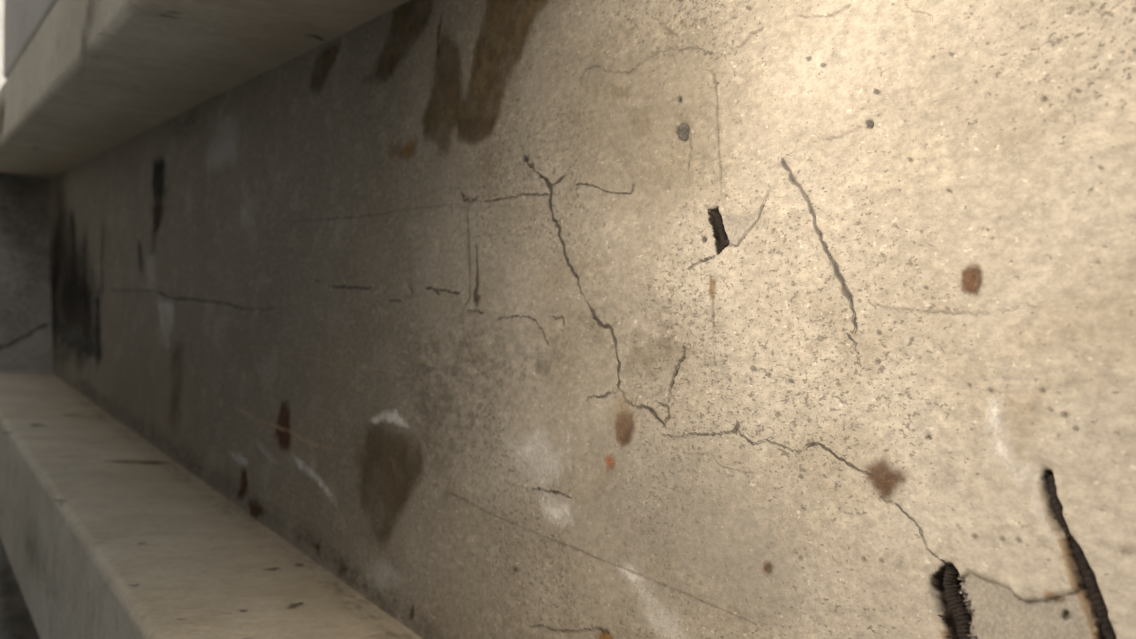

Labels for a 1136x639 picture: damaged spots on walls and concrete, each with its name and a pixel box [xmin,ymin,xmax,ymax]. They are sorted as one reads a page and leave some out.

water stain [377,0,546,140]
water stain [152,159,165,232]
spalling [702,203,764,255]
water stain [50,212,102,365]
corrosion [961,265,980,294]
crack [484,157,950,566]
corrosion [275,405,290,448]
corrosion [615,411,633,445]
water stain [361,409,420,539]
corrosion [870,463,899,495]